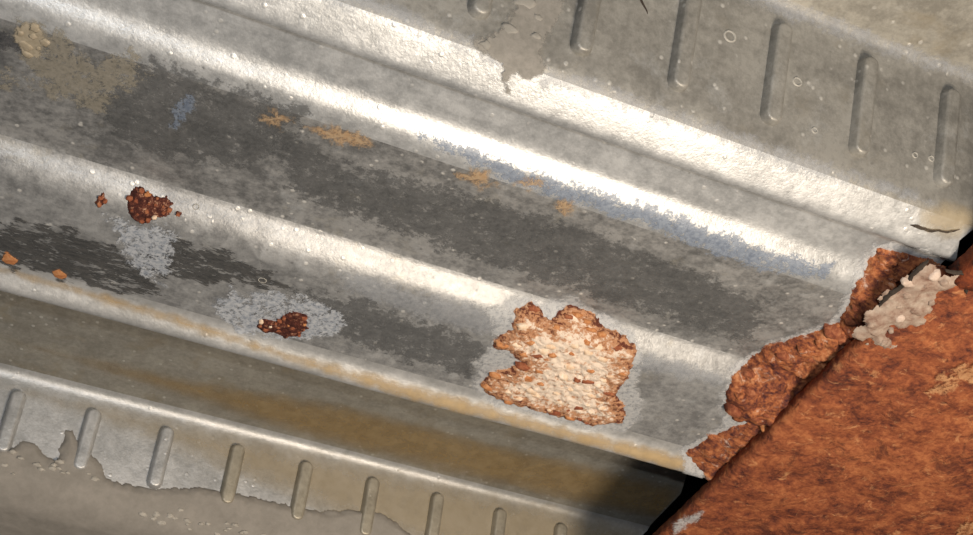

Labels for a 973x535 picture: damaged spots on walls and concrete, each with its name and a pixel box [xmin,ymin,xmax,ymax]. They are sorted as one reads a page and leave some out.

corrosion [95,186,199,286]
water stain [0,20,770,344]
water stain [410,129,835,279]
water stain [0,217,485,379]
corrosion [176,277,347,358]
corrosion [771,241,947,343]
peeling [823,255,949,346]
corrosion [306,296,760,479]
peeling [724,392,752,418]
peeling [741,366,756,379]
corrosion [926,363,973,397]
water stain [0,430,411,535]